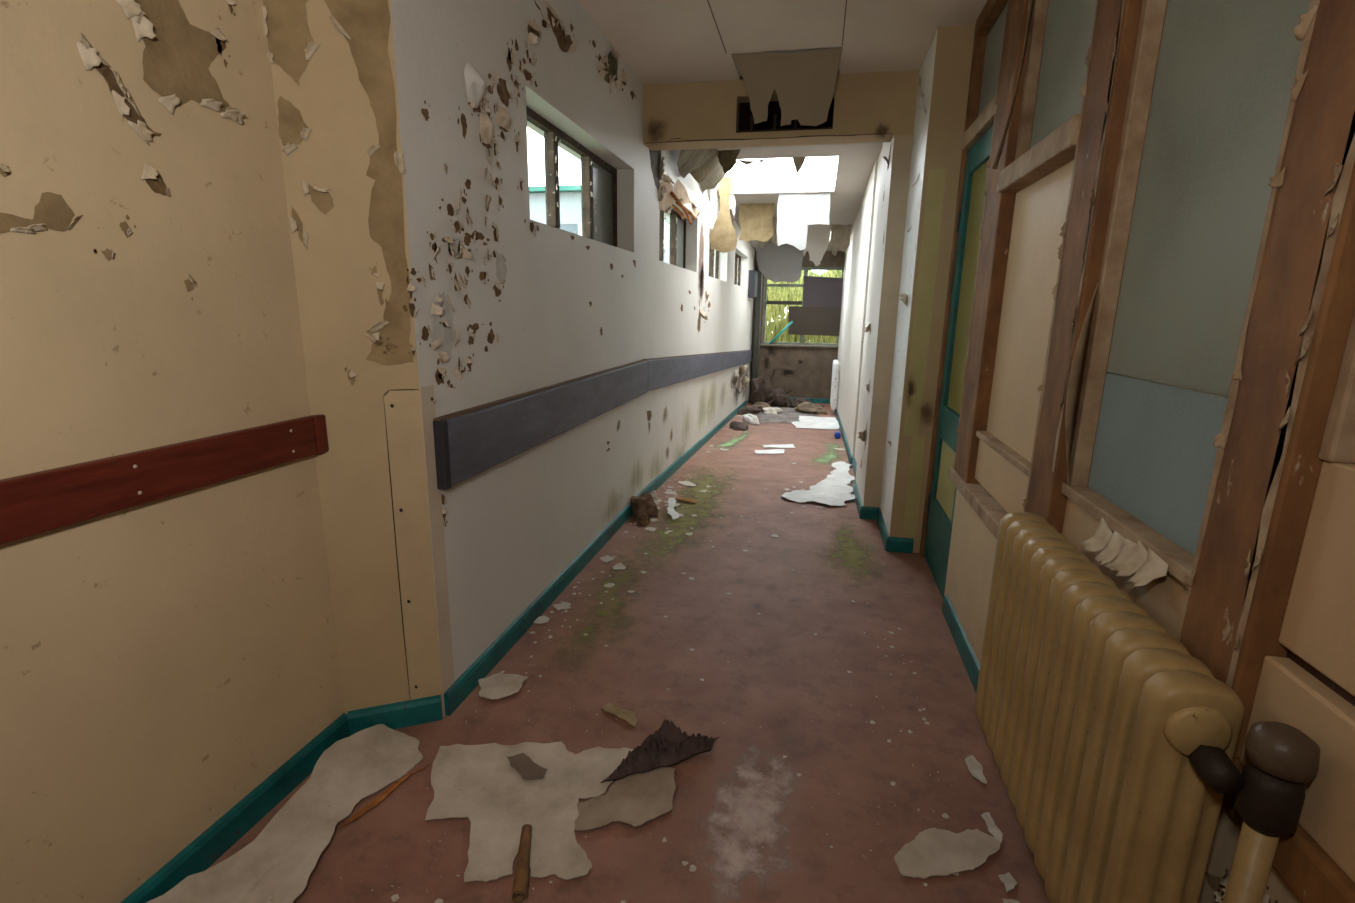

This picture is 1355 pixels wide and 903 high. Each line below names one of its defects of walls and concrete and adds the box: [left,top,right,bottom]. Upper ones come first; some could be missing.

peeling [75,33,162,146]
peeling [116,0,246,125]
peeling [262,0,320,86]
peeling [0,163,11,177]
peeling [93,248,116,261]
peeling [119,214,136,238]
peeling [140,163,171,197]
peeling [184,274,197,301]
peeling [325,0,636,403]
flaking render [649,149,701,258]